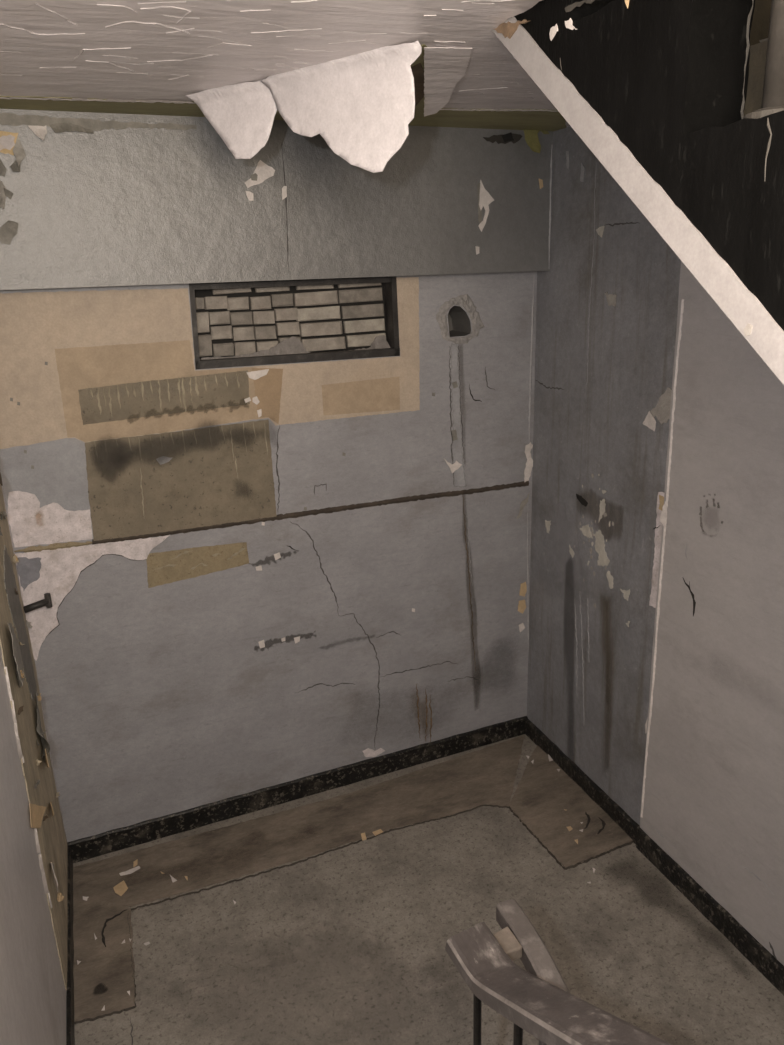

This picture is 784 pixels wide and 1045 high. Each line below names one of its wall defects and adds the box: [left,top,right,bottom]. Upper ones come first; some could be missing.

crack [0,0,322,80]
crack [424,0,511,16]
peeling [0,41,567,245]
peeling [0,277,420,449]
flaking render [436,294,485,344]
crack [14,427,529,747]
spalling [254,633,316,651]
water stain [445,344,476,671]
peeling [517,442,533,519]
peeling [569,473,630,601]
peeling [0,473,170,990]
peeling [363,748,385,757]